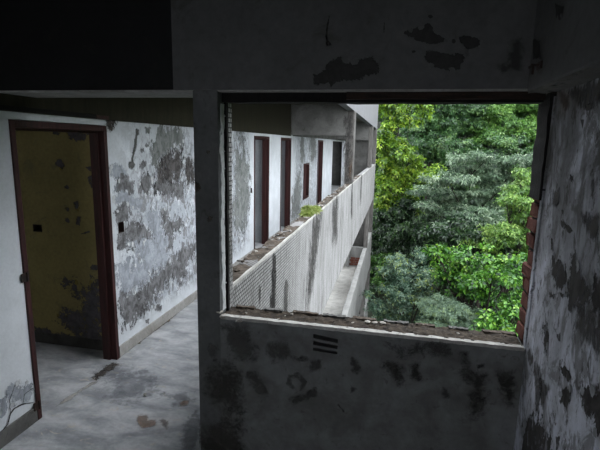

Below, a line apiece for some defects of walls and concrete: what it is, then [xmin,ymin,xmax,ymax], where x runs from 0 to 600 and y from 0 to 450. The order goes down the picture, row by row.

peeling [404,15,483,72]
peeling [313,56,379,89]
peeling [109,125,197,334]
leakage [581,212,599,240]
leakage [306,212,322,305]
leakage [574,304,600,361]
leakage [526,349,550,416]